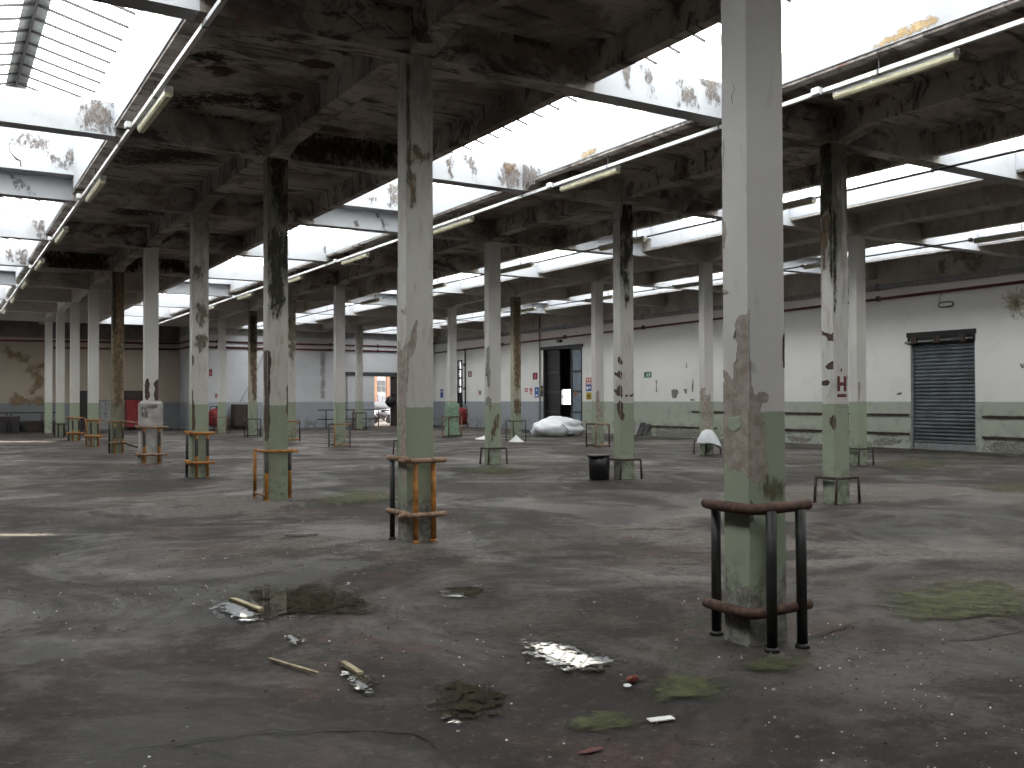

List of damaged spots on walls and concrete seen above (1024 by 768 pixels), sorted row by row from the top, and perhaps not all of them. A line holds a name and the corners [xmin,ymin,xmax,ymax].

peeling [9,133,74,168]
leakage [268,134,398,357]
leakage [820,143,837,312]
leakage [5,346,44,406]
peeling [398,306,418,487]
peeling [614,357,633,420]
peeling [700,310,768,483]